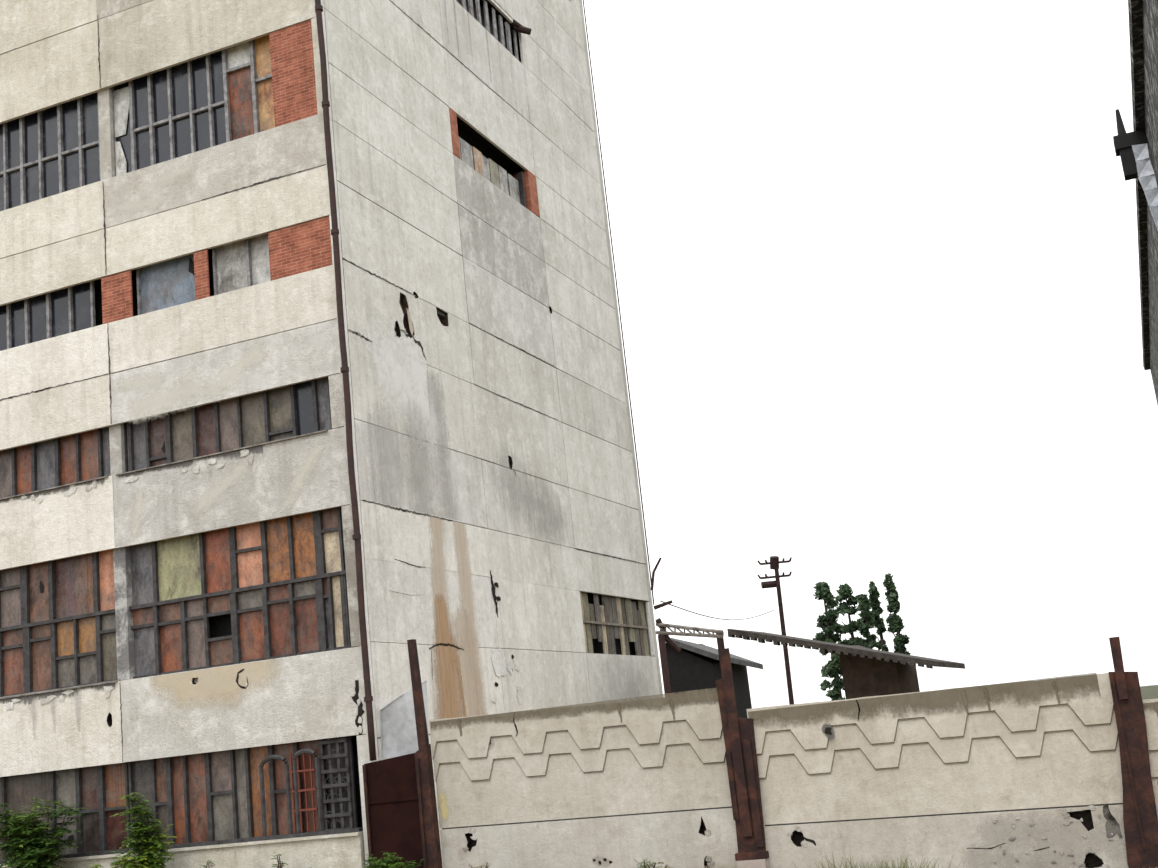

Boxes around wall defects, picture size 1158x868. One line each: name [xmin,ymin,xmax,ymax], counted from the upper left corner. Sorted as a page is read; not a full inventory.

spalling [394,291,428,373]
corrosion [430,516,485,719]
spalling [462,828,477,852]
spalling [699,817,712,836]
hole [787,826,816,847]
spalling [967,805,1110,868]